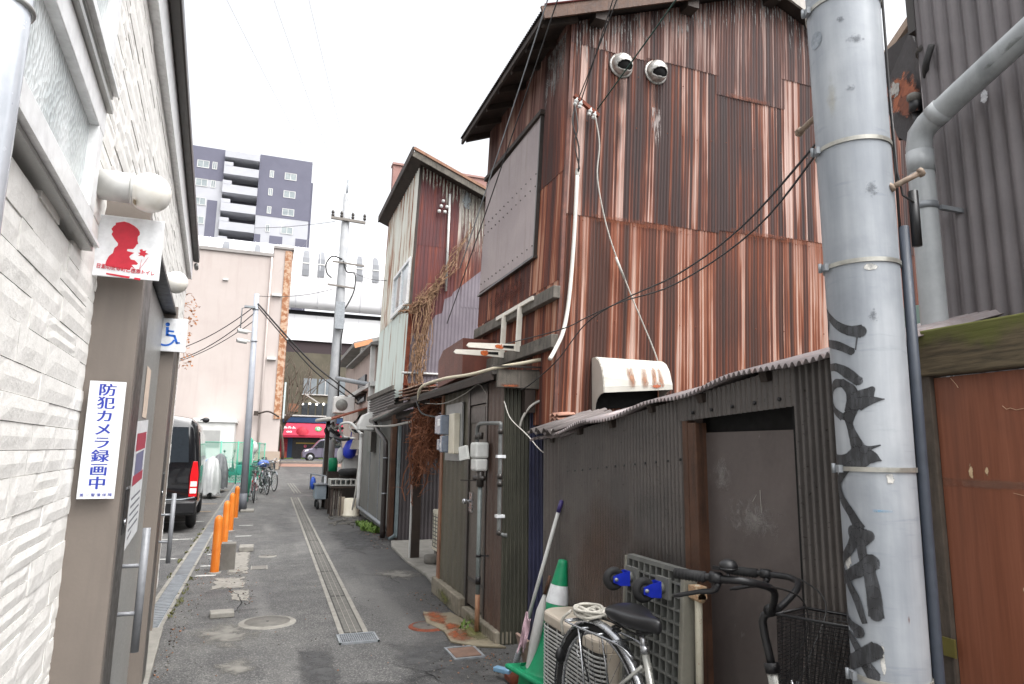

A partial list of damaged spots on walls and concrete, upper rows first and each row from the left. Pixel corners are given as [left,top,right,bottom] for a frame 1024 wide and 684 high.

rust [652,90,660,141]
rust [887,72,917,118]
rust [628,369,664,389]